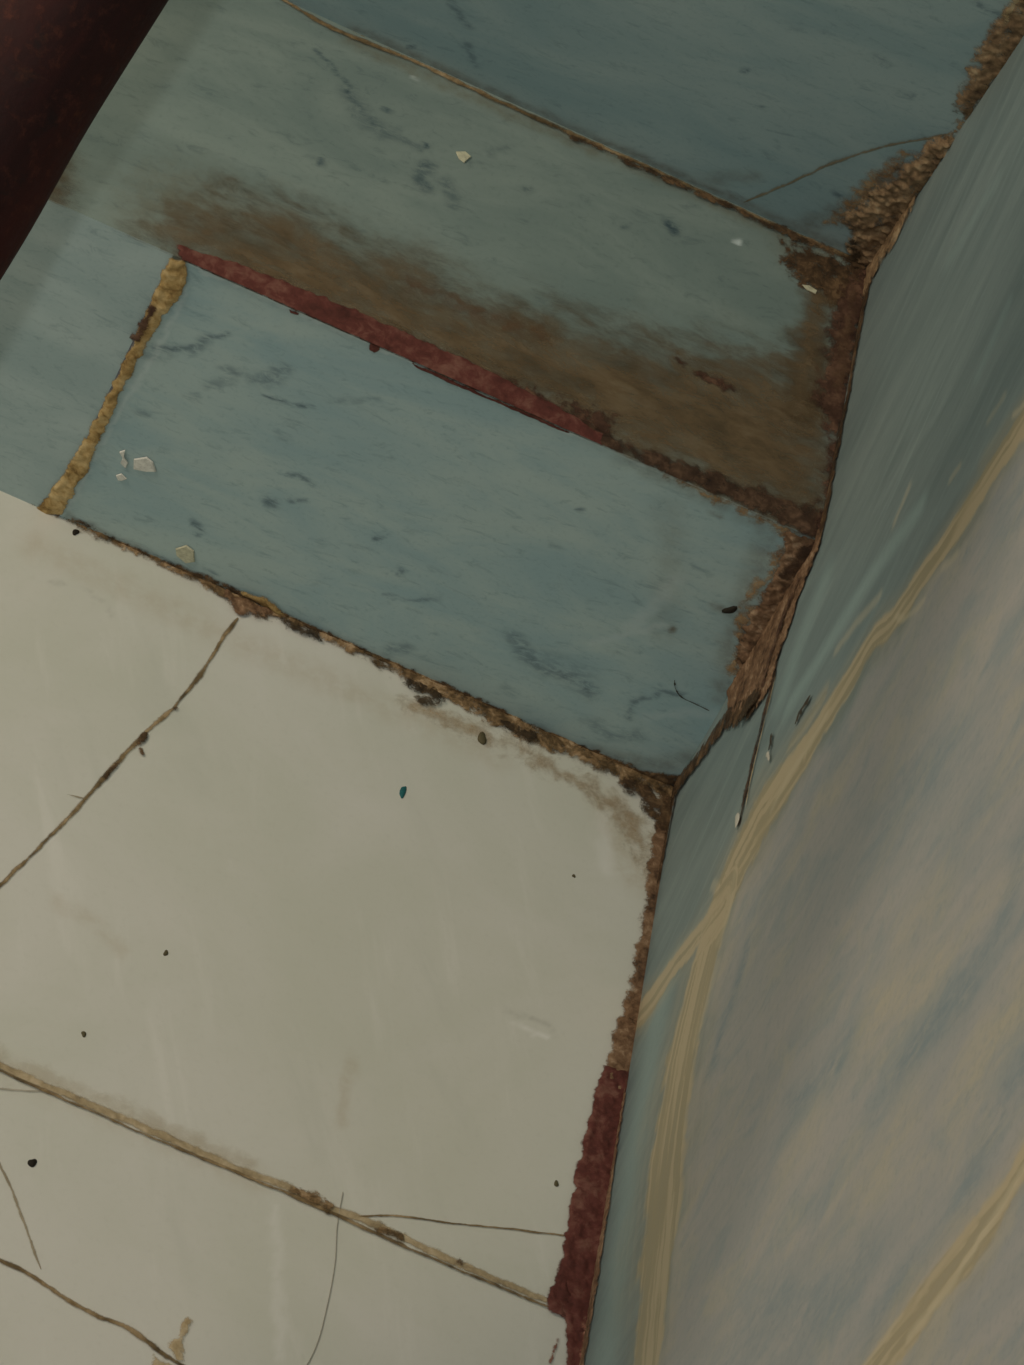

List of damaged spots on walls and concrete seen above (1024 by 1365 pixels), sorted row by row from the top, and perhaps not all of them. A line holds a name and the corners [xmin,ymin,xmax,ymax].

spalling [944,0,1024,151]
leakage [156,206,839,512]
crack [0,618,239,887]
crack [0,1164,192,1365]
crack [0,1062,565,1307]
peeling [547,1016,637,1365]